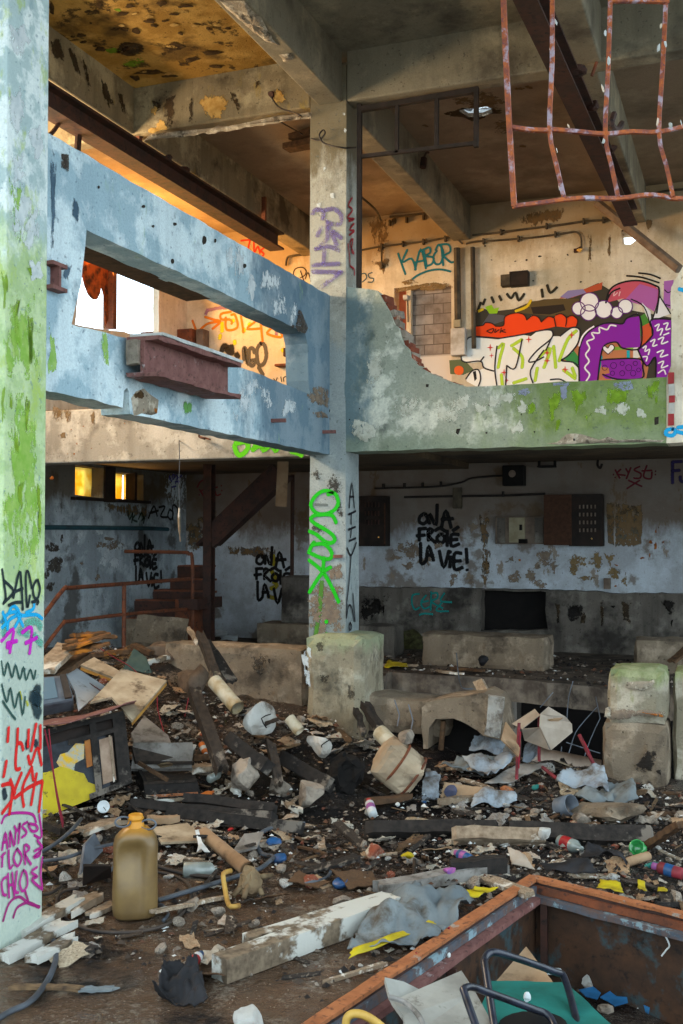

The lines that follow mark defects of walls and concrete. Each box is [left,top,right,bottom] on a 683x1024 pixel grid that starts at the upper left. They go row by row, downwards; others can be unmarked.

peeling [366,353,382,384]
peeling [381,279,530,434]
peeling [553,382,571,399]
peeling [595,380,646,418]